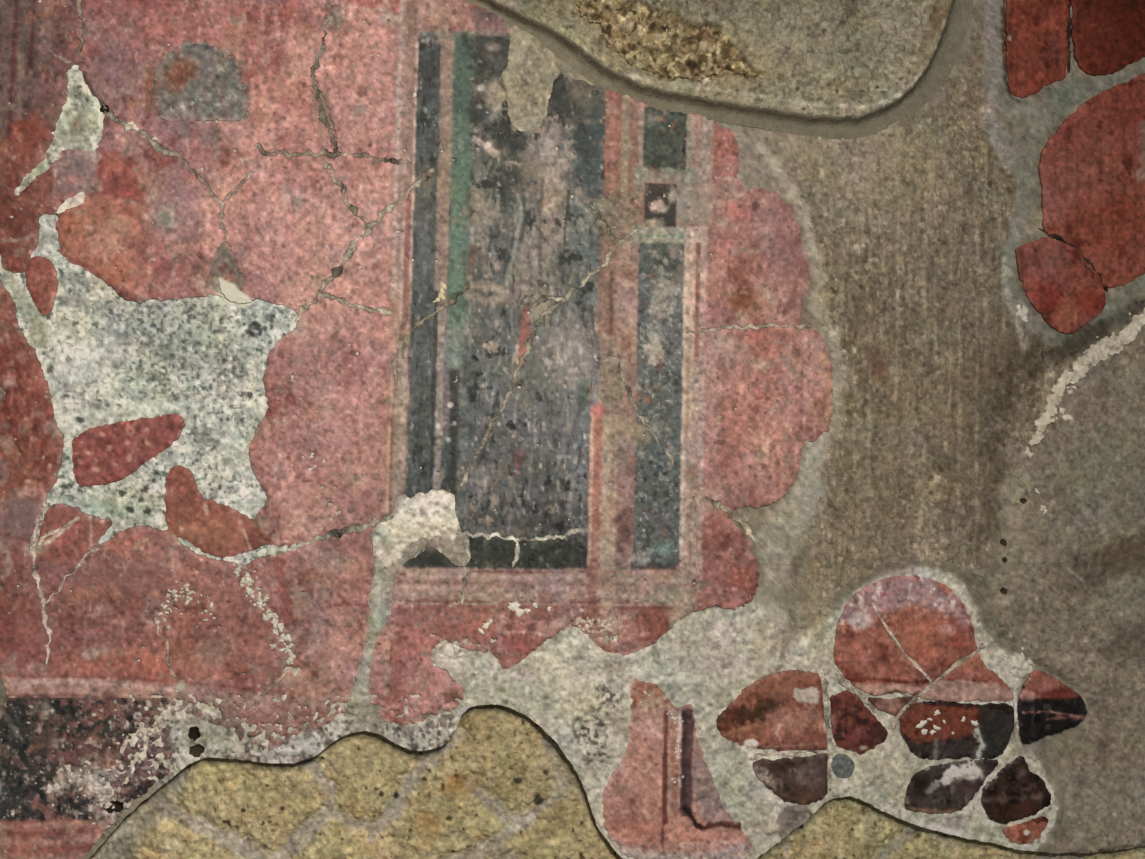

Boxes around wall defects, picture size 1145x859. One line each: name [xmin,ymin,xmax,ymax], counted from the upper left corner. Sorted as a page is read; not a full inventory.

flaking render [15,65,105,195]
peeling [149,44,249,122]
crack [103,13,470,383]
spalling [576,0,762,86]
flaking render [0,192,298,677]
crack [457,200,640,493]
water stain [1028,307,1145,446]
crack [29,500,99,664]
crack [457,527,591,604]
peeling [508,601,552,618]
crack [746,609,987,791]
peeling [916,709,979,735]